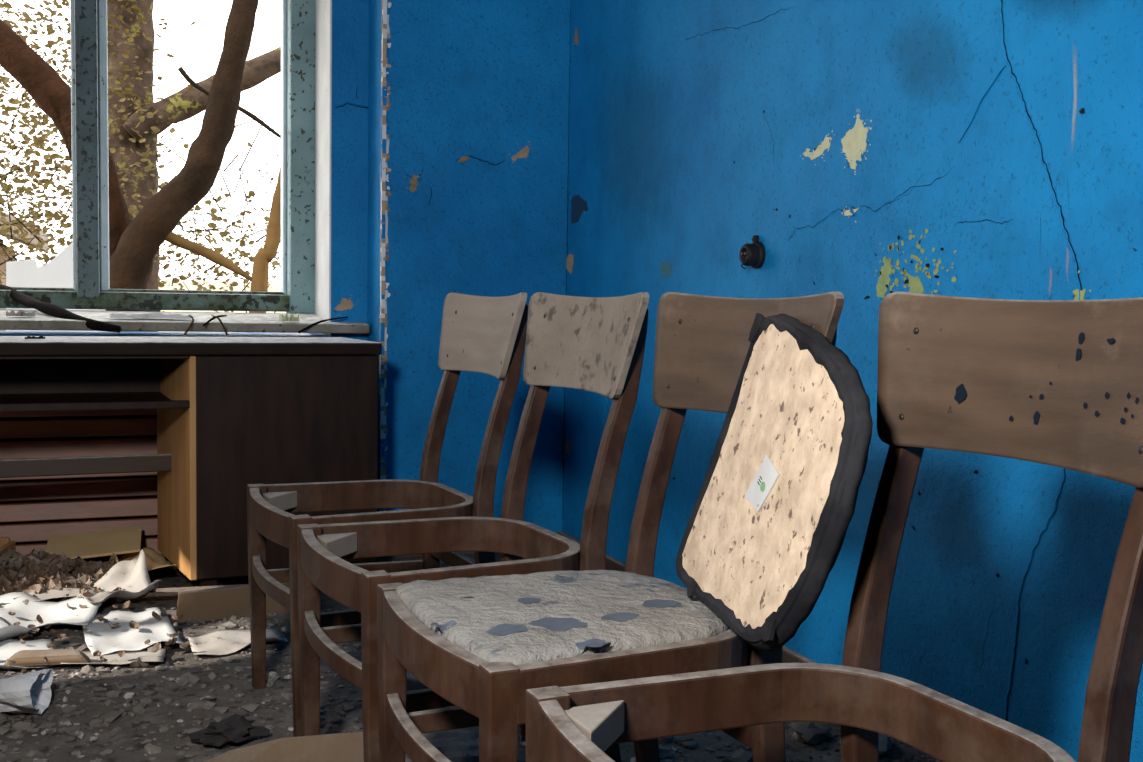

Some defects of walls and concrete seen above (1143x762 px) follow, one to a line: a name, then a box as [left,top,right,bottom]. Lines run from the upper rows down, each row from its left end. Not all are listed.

peeling [509,140,532,163]
peeling [800,110,872,175]
crack [789,0,1082,300]
peeling [864,228,957,301]
crack [980,468,1066,721]